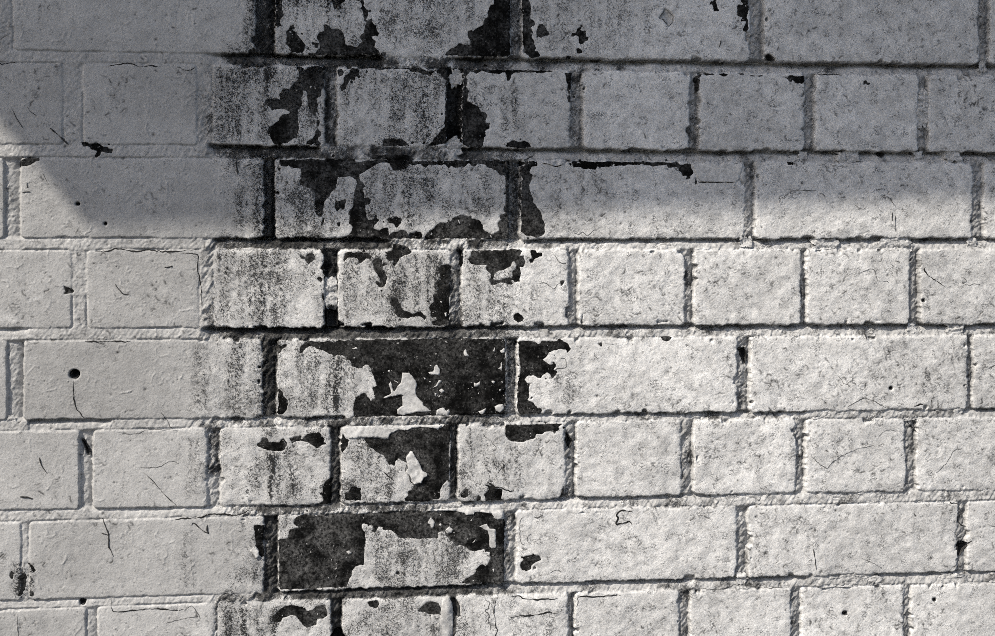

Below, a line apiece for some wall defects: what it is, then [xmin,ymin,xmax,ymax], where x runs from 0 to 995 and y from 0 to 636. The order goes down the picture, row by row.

peeling [265,0,743,326]
peeling [257,433,326,451]
peeling [277,336,571,590]
peeling [254,525,267,557]
peeling [272,604,330,628]
peeling [418,601,441,616]